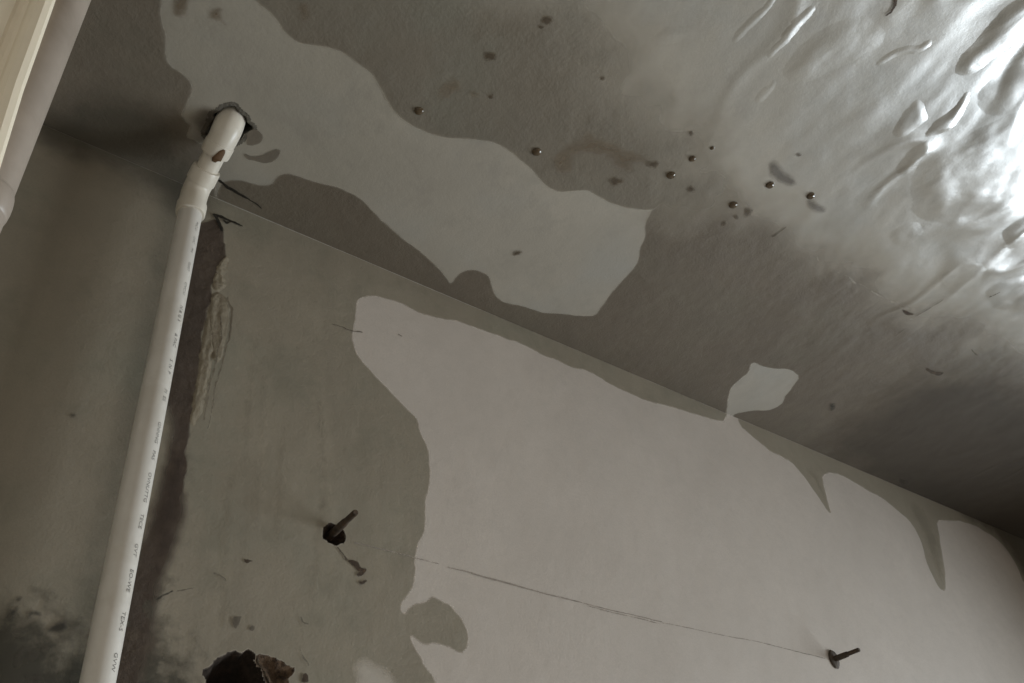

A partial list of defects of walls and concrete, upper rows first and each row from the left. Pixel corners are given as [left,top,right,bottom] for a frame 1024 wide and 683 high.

water stain [0,0,213,683]
flaking render [190,256,233,427]
water stain [138,174,1024,683]
flaking render [337,547,367,585]
spalling [202,649,308,683]